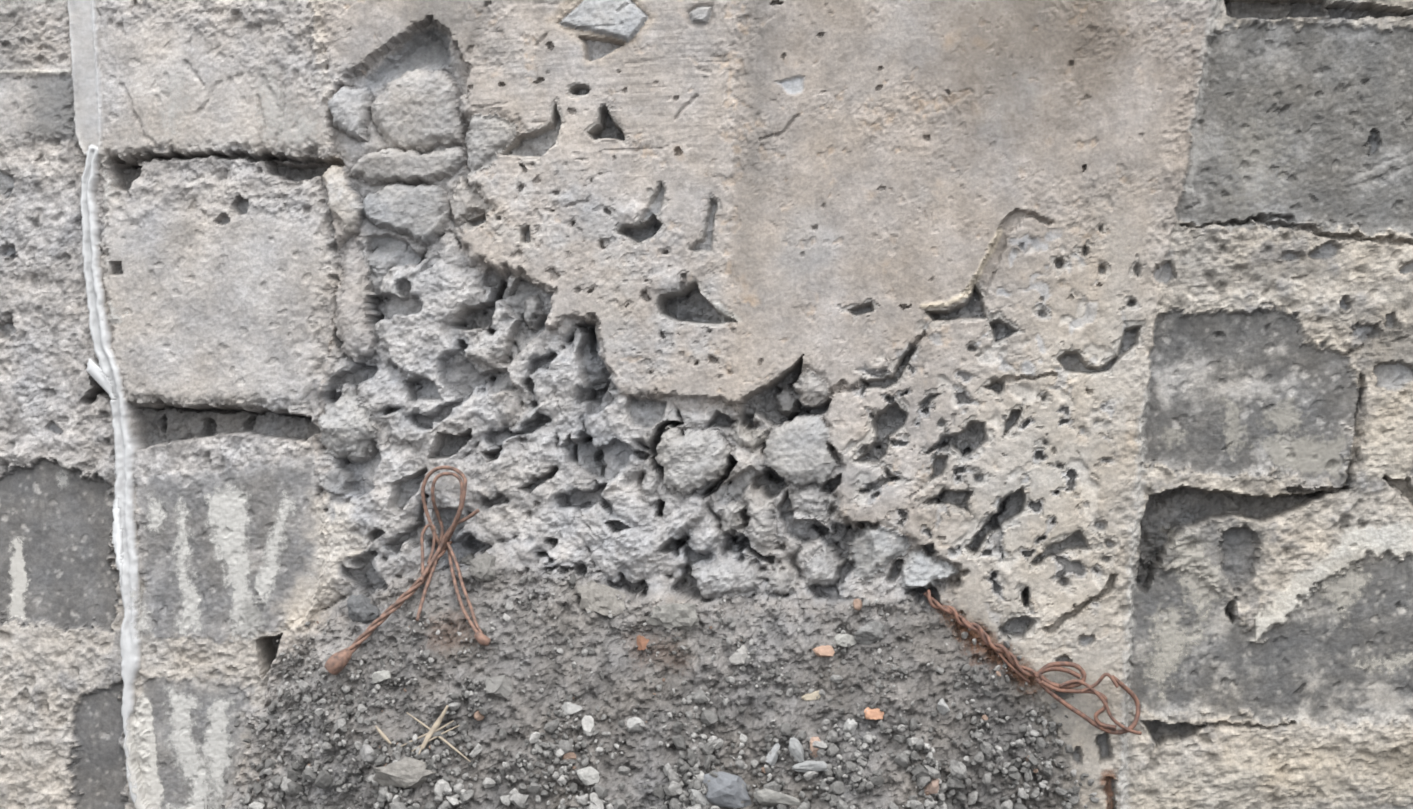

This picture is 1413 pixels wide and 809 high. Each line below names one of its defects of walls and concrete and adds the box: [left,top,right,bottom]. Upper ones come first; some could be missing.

spalling [551,0,657,63]
spalling [685,5,717,30]
spalling [307,18,1143,648]
crack [68,0,346,804]
rust [940,610,1042,692]
crack [1141,720,1299,753]